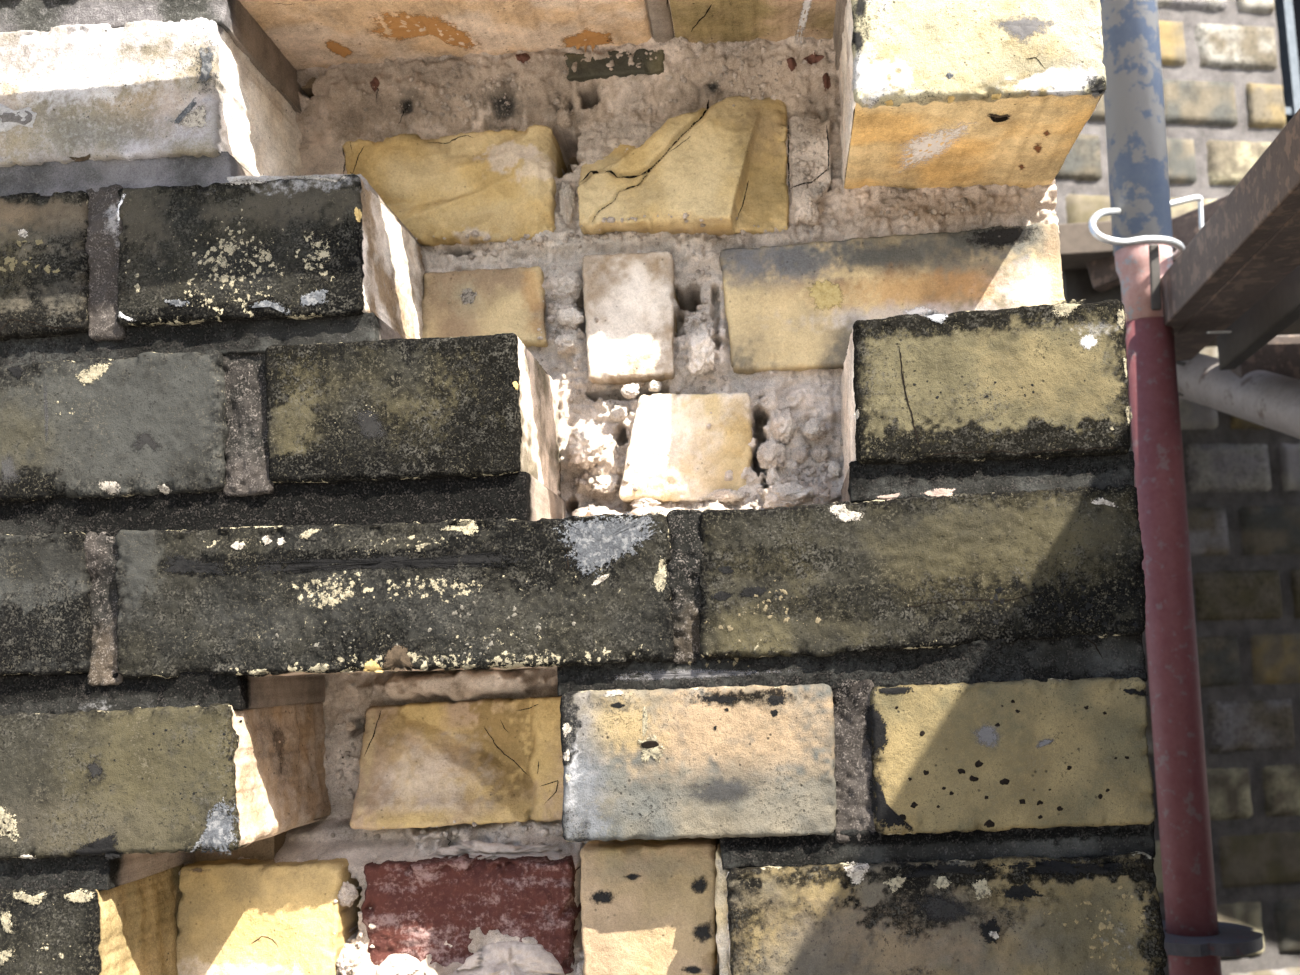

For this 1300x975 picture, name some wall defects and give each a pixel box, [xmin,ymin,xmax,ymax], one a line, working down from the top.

crack [582,100,709,218]
spalling [460,288,477,306]